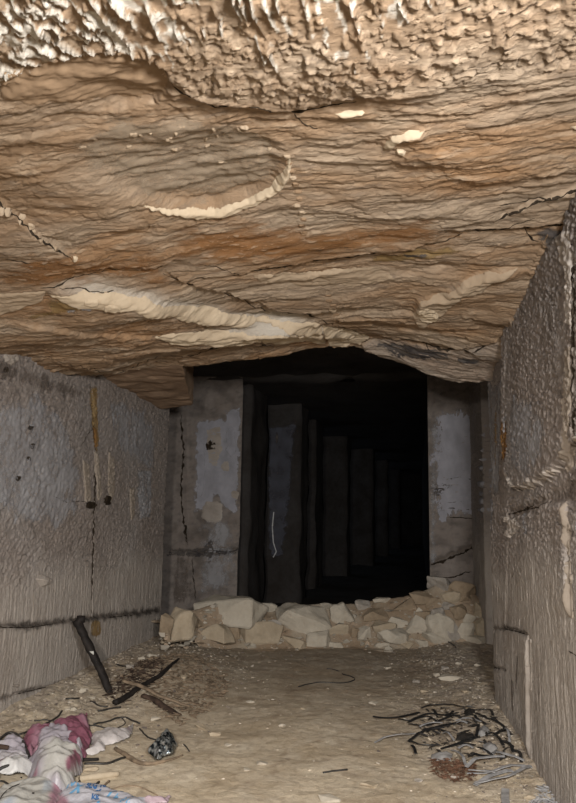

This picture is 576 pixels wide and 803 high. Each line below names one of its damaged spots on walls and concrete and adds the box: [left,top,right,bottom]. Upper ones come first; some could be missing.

crack [165,71,227,108]
crack [291,101,356,129]
crack [424,189,576,245]
crack [0,201,375,311]
crack [405,339,485,356]
crack [568,244,576,444]